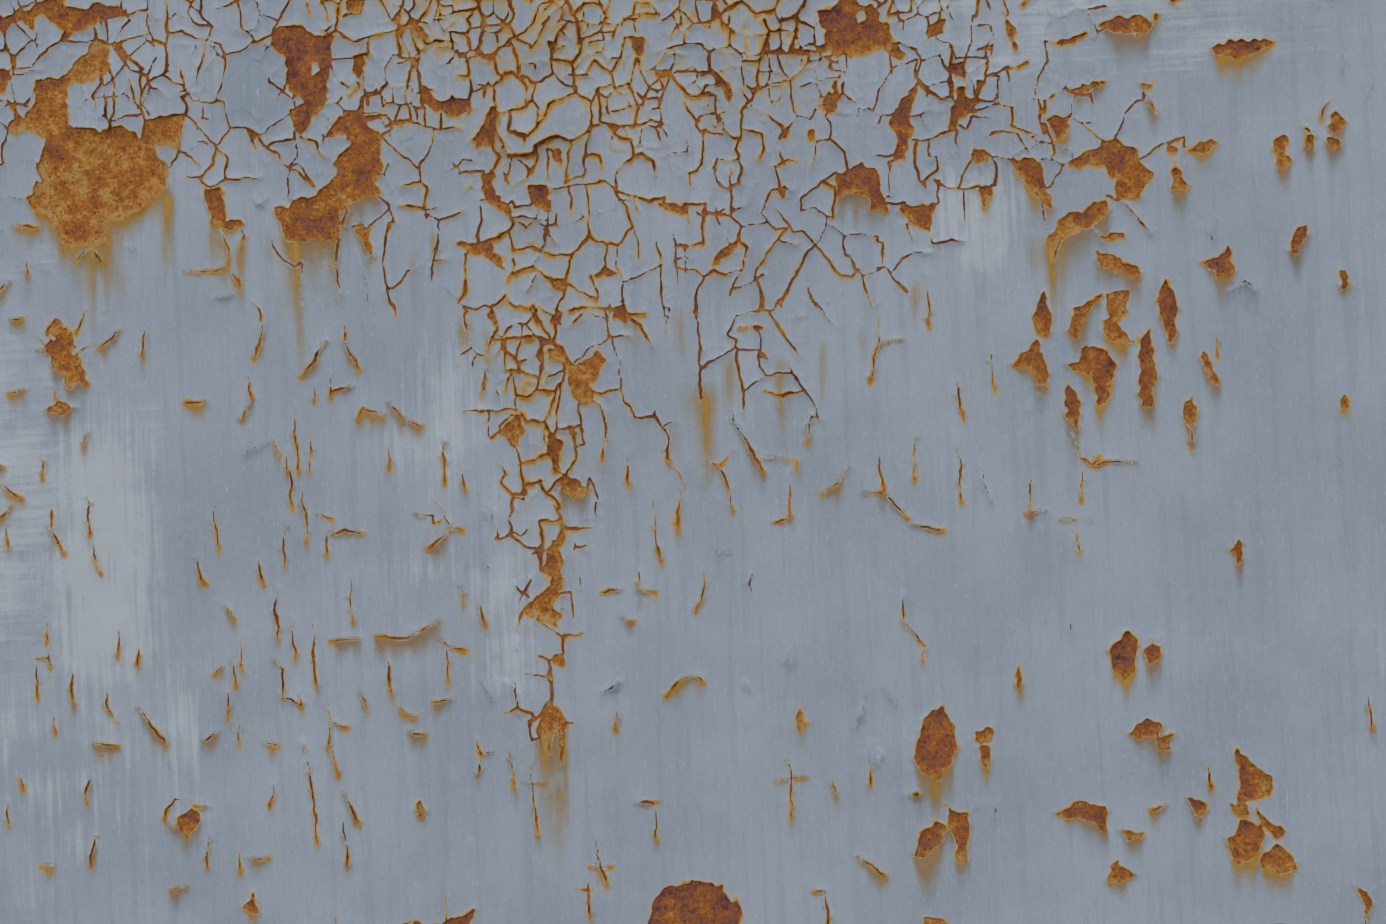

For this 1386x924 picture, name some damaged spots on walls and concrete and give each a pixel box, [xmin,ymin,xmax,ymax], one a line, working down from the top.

crack [0,430,106,579]
rust [0,0,185,422]
crack [31,227,554,924]
rust [267,16,388,321]
peeling [0,0,1076,775]
crack [595,339,1003,630]
crack [1021,425,1144,567]
peeling [1062,85,1146,143]
rust [1007,75,1231,435]
peeling [1139,137,1185,162]
rust [644,874,749,924]
rust [900,701,1002,883]